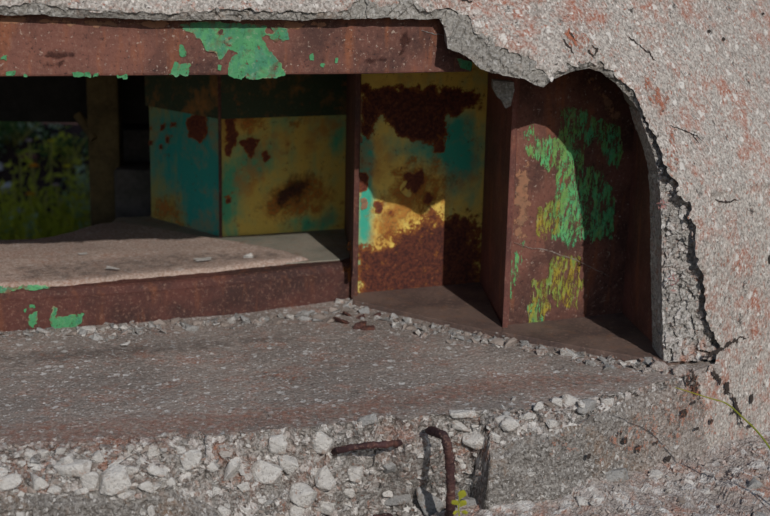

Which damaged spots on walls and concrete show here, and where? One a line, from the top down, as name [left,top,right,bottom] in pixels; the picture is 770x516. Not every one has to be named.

corrosion [0,15,28,25]
corrosion [39,18,118,28]
corrosion [129,20,169,29]
corrosion [247,21,327,30]
corrosion [45,52,74,65]
corrosion [148,115,208,150]
corrosion [224,118,271,162]
corrosion [267,173,330,219]
spalling [0,0,720,374]
corrosion [344,83,483,298]
crack [685,336,749,427]
spalling [0,364,707,516]